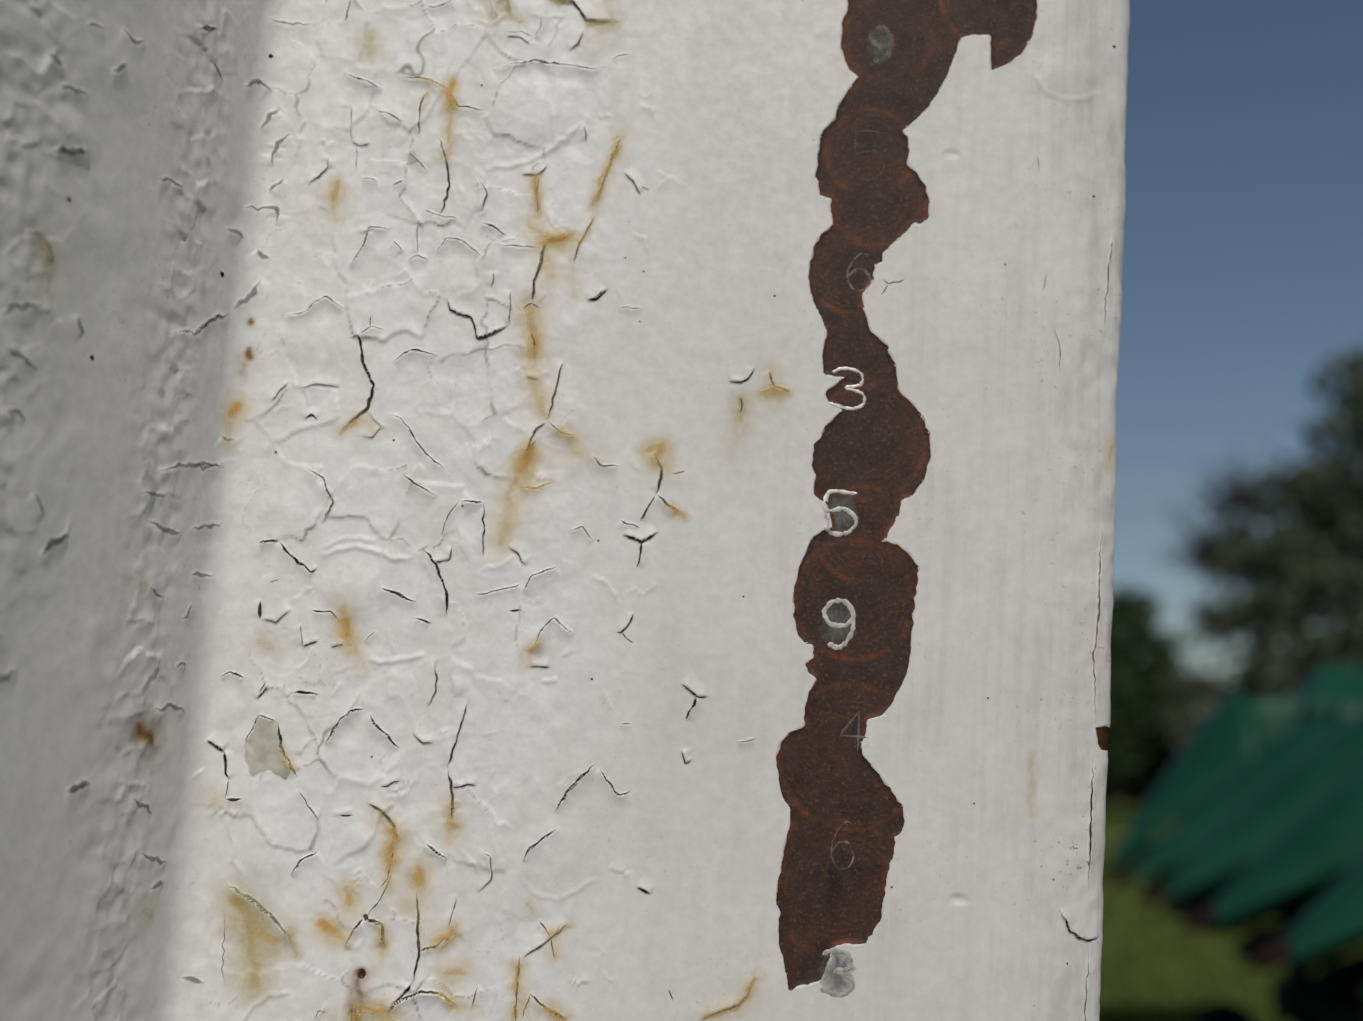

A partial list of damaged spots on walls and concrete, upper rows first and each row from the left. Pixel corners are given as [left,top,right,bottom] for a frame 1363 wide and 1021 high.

rust [445,79,457,141]
rust [592,142,620,205]
rust [531,228,573,245]
rust [519,446,534,472]
crack [208,0,684,1021]
crack [681,673,709,764]
peeling [244,715,290,780]
rust [386,827,400,873]
rust [316,919,338,935]
rust [349,969,392,1021]
rust [512,965,520,991]
crack [669,973,767,1020]